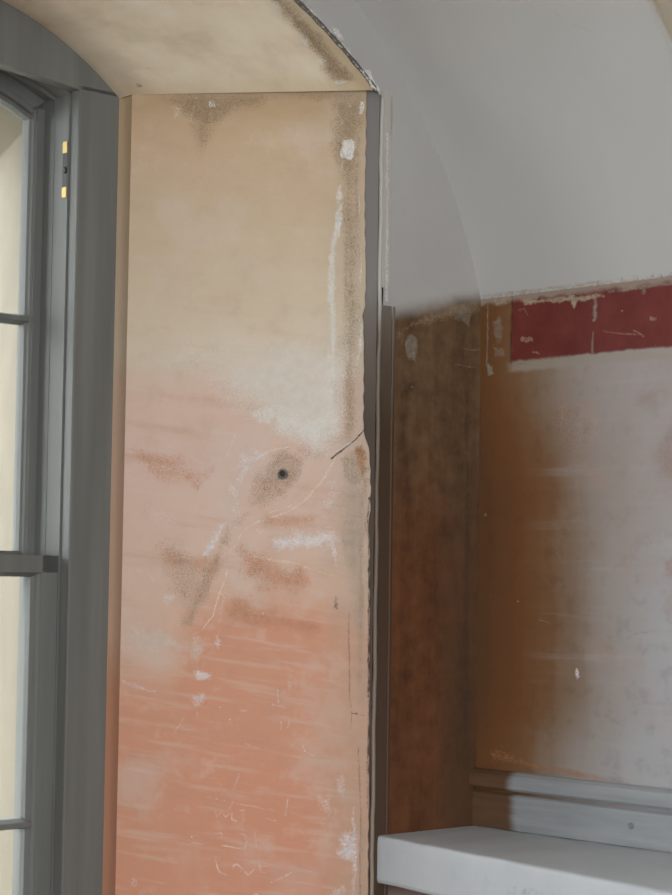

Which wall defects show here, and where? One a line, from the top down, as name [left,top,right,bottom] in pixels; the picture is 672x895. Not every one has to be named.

damp [160,0,366,442]
peeling [520,281,670,322]
damp [126,437,328,680]